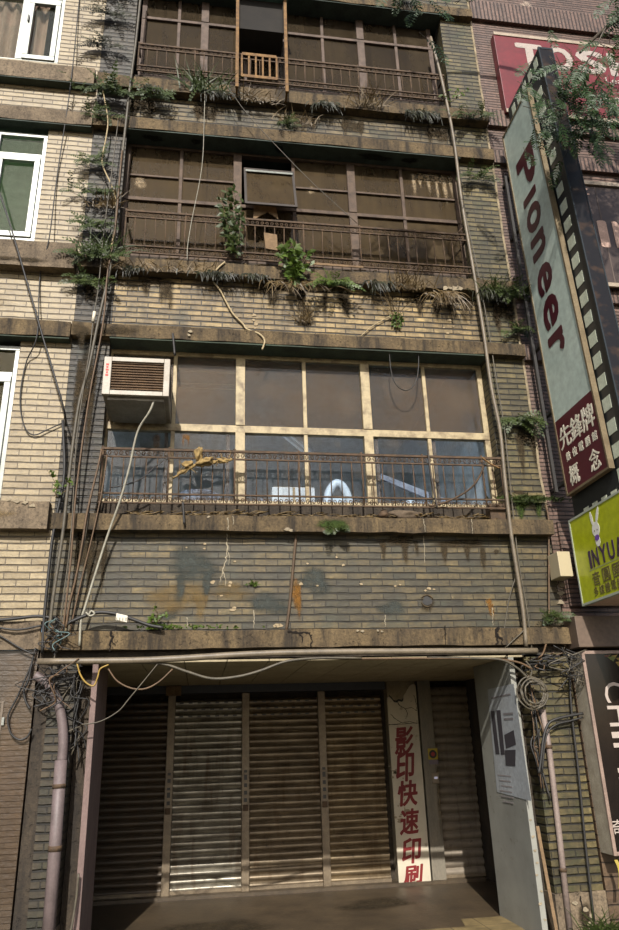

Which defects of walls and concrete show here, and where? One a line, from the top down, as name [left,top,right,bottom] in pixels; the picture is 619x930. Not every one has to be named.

damp [412,174,452,194]
damp [381,536,418,561]
damp [162,550,215,619]